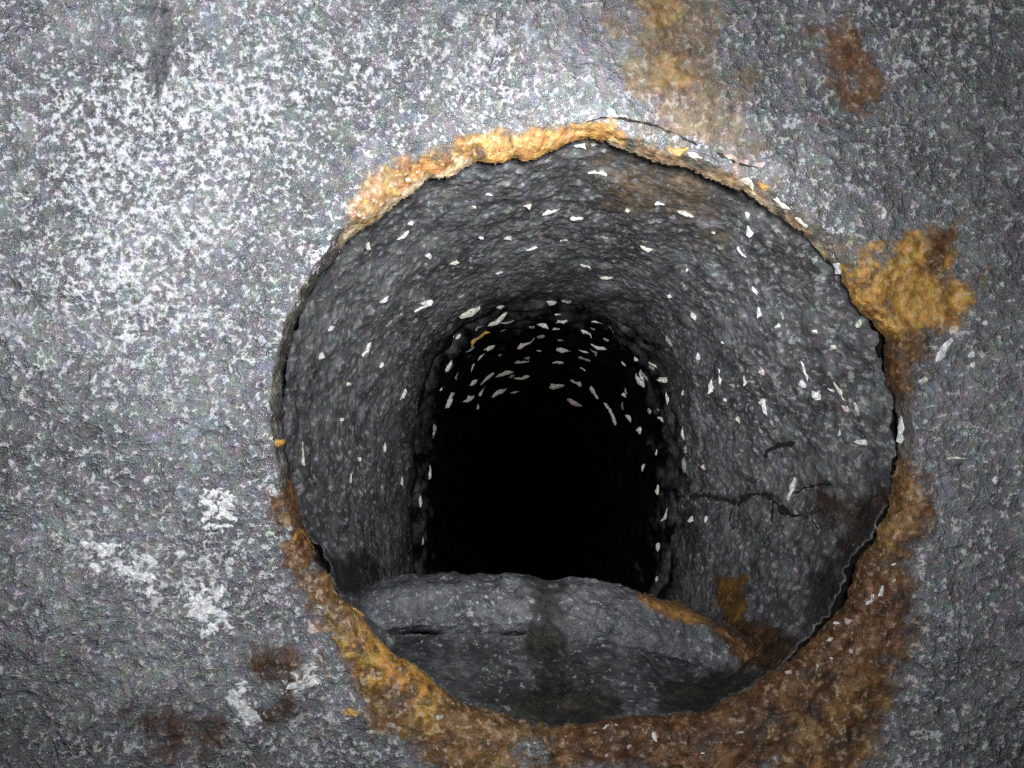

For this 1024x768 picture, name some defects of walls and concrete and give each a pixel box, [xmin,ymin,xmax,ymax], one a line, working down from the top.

rust [805,18,888,116]
crack [590,117,765,168]
rust [840,230,975,399]
crack [671,441,834,532]
rust [265,457,936,768]
rust [250,643,307,727]